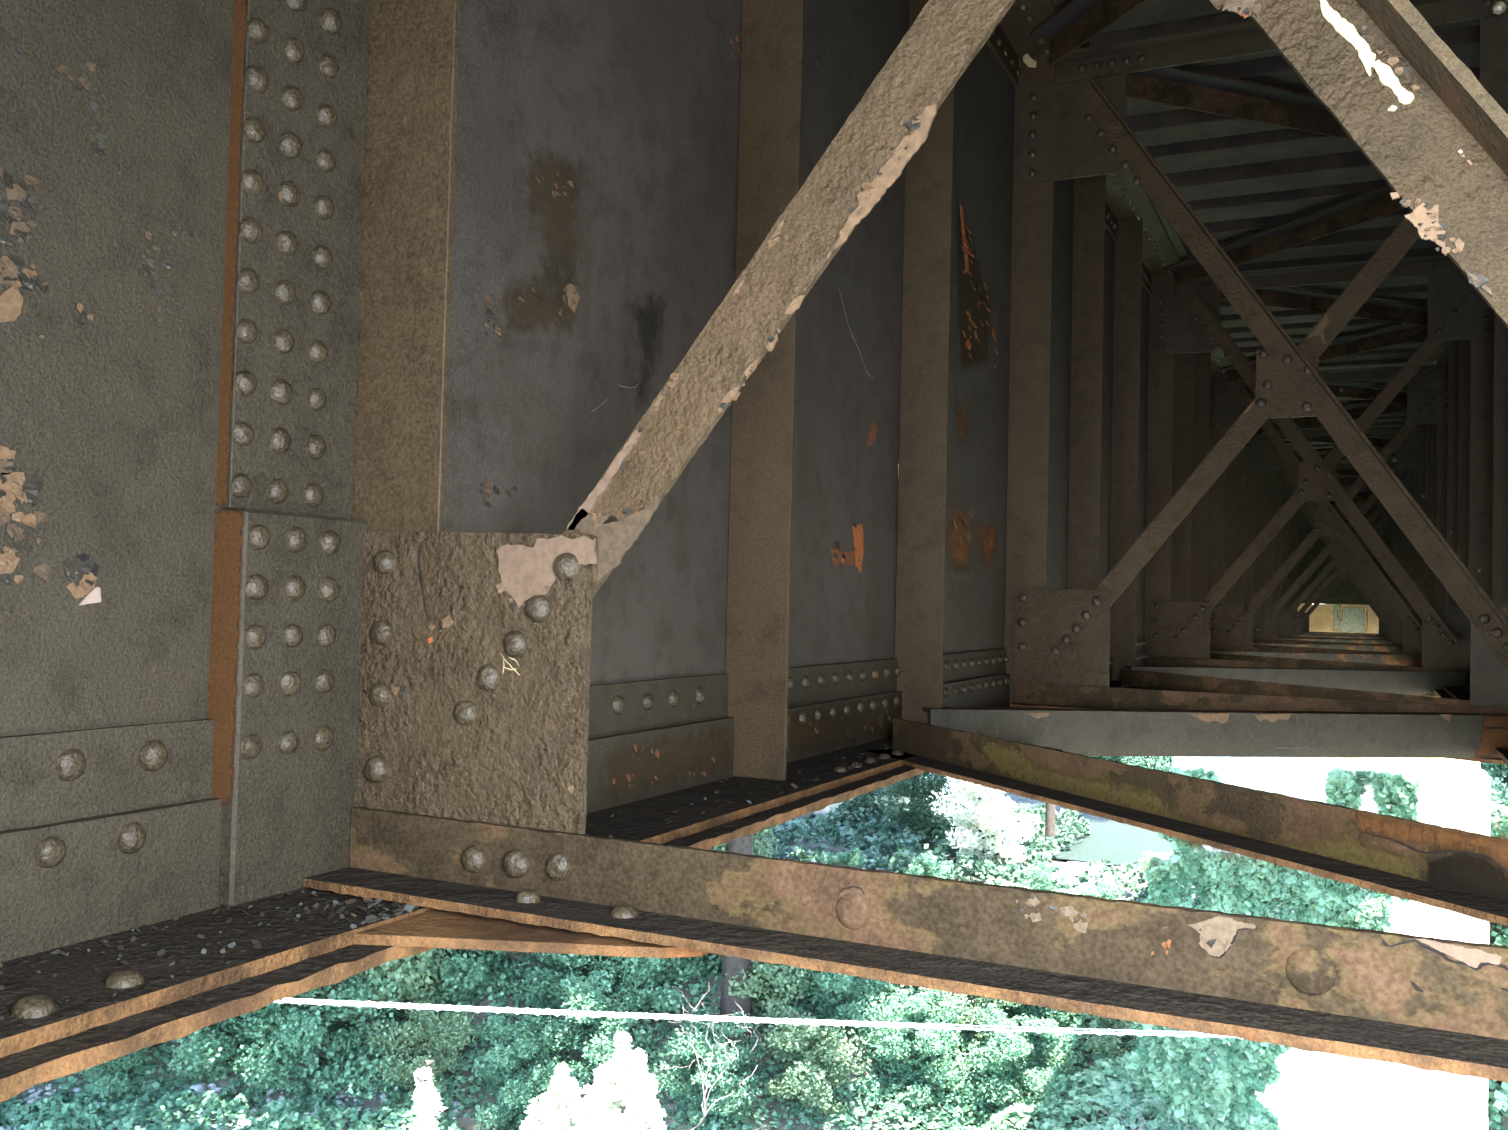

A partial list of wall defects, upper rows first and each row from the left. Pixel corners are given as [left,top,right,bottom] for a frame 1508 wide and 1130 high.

peeling [1320,0,1420,112]
peeling [0,168,49,323]
peeling [826,103,937,260]
corrosion [958,204,998,368]
peeling [1390,192,1464,256]
peeling [1464,271,1492,296]
peeling [717,295,805,413]
peeling [0,445,101,605]
peeling [497,427,660,608]
corrosion [830,522,864,573]
corrosion [949,511,997,570]
peeling [1188,915,1257,959]